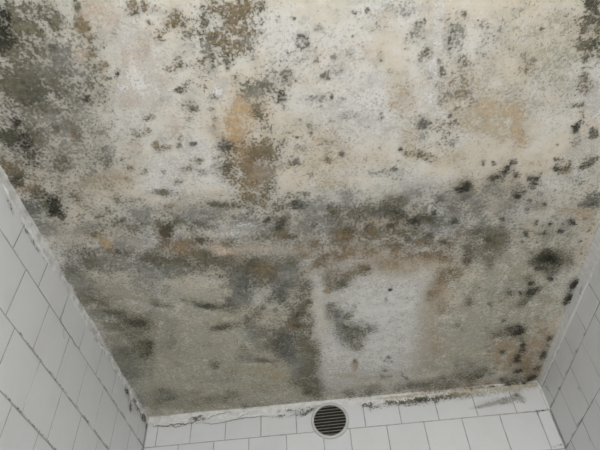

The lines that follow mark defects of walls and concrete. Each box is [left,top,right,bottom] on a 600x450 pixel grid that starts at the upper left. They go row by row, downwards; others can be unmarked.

leakage [123,0,160,16]
leakage [154,0,265,102]
leakage [231,52,292,132]
leakage [295,23,353,82]
leakage [369,0,477,180]
leakage [474,0,600,147]
leakage [176,136,212,165]
leakage [553,154,600,210]
leakage [563,278,579,306]
leakage [325,302,380,353]
crack [155,412,268,428]
leakage [476,393,524,408]